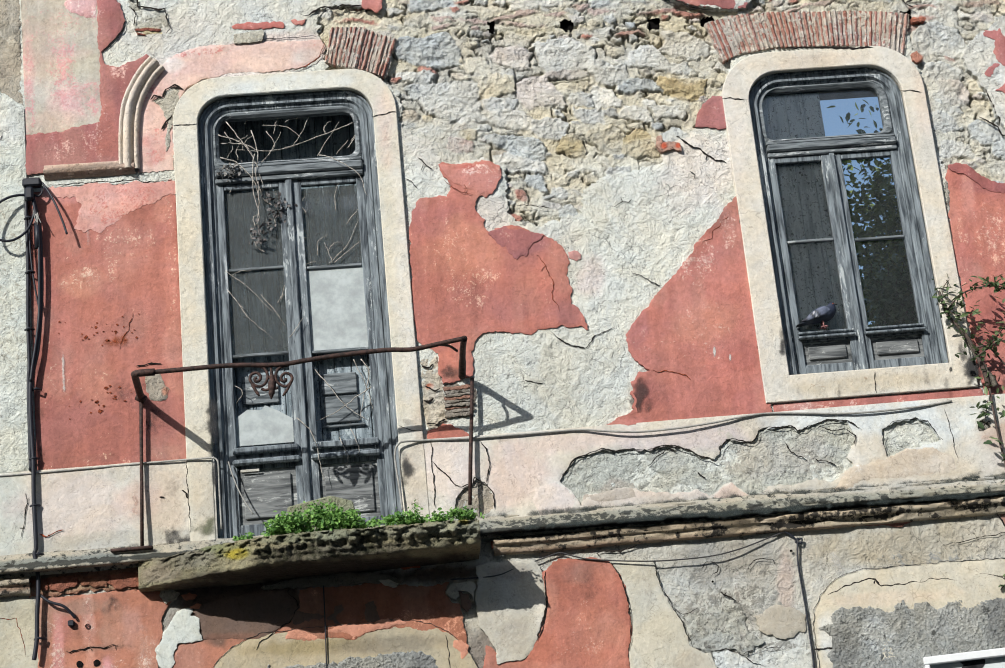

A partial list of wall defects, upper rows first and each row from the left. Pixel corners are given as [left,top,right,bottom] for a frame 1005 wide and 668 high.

crack [676,0,713,10]
crack [263,4,361,71]
peeling [0,0,171,175]
spalling [28,0,1005,517]
leakage [532,506,601,515]
leakage [728,490,807,515]
leakage [824,484,884,508]
leakage [915,474,995,500]
crack [828,578,952,595]
peeling [38,572,247,668]
peeling [272,557,813,668]